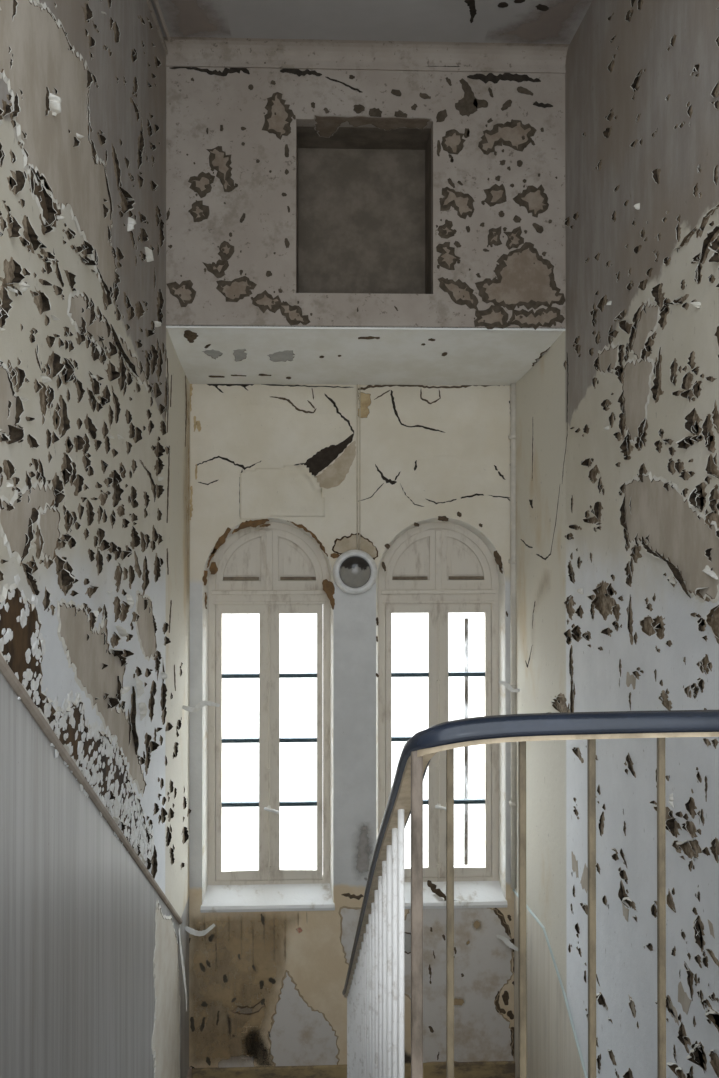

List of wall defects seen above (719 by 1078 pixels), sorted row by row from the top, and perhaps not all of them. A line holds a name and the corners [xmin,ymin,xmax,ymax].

crack [464,0,477,23]
peeling [202,232,312,326]
peeling [311,77,579,330]
peeling [0,0,196,879]
crack [195,456,261,514]
flaking render [202,433,390,610]
crack [207,384,510,433]
peeling [548,200,719,713]
peeling [649,767,719,872]
water stain [189,914,302,1069]
peeling [404,908,514,1063]
peeling [655,885,719,1078]